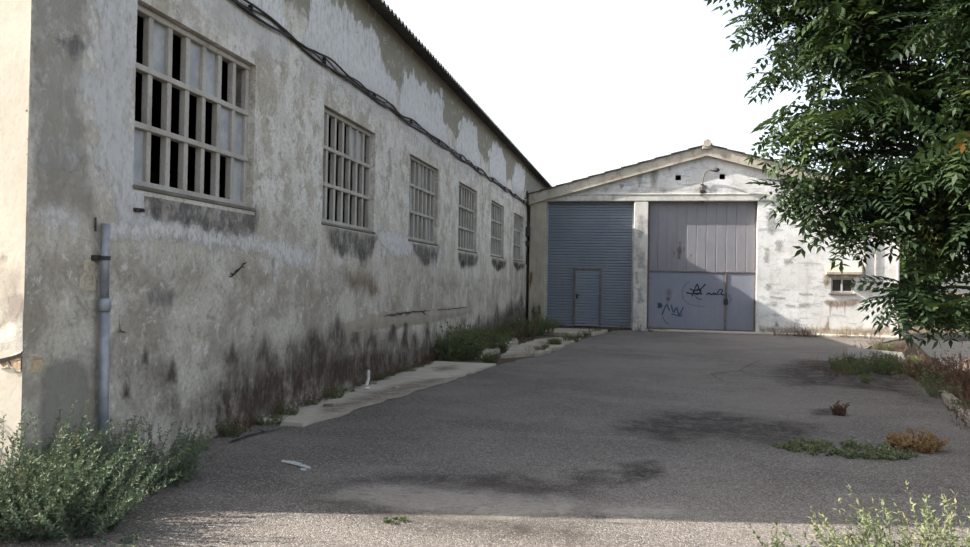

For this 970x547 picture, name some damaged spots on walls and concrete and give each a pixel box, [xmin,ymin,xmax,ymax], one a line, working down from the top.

water stain [331,228,442,266]
water stain [459,254,475,267]
spalling [0,352,46,375]
water stain [217,320,431,418]